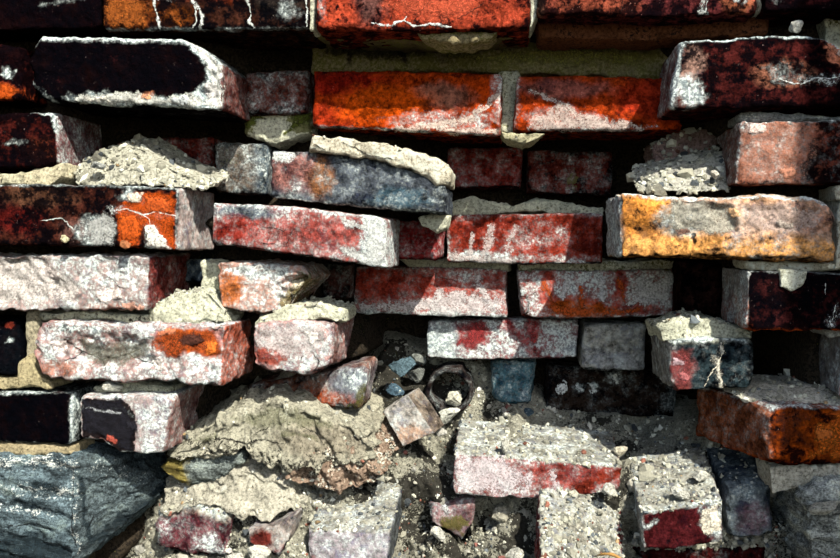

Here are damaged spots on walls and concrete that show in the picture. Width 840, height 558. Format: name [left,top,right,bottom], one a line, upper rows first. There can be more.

crack [191,0,204,30]
crack [110,208,176,223]
spalling [386,353,426,397]
peeling [669,353,691,385]
peeling [701,505,721,534]